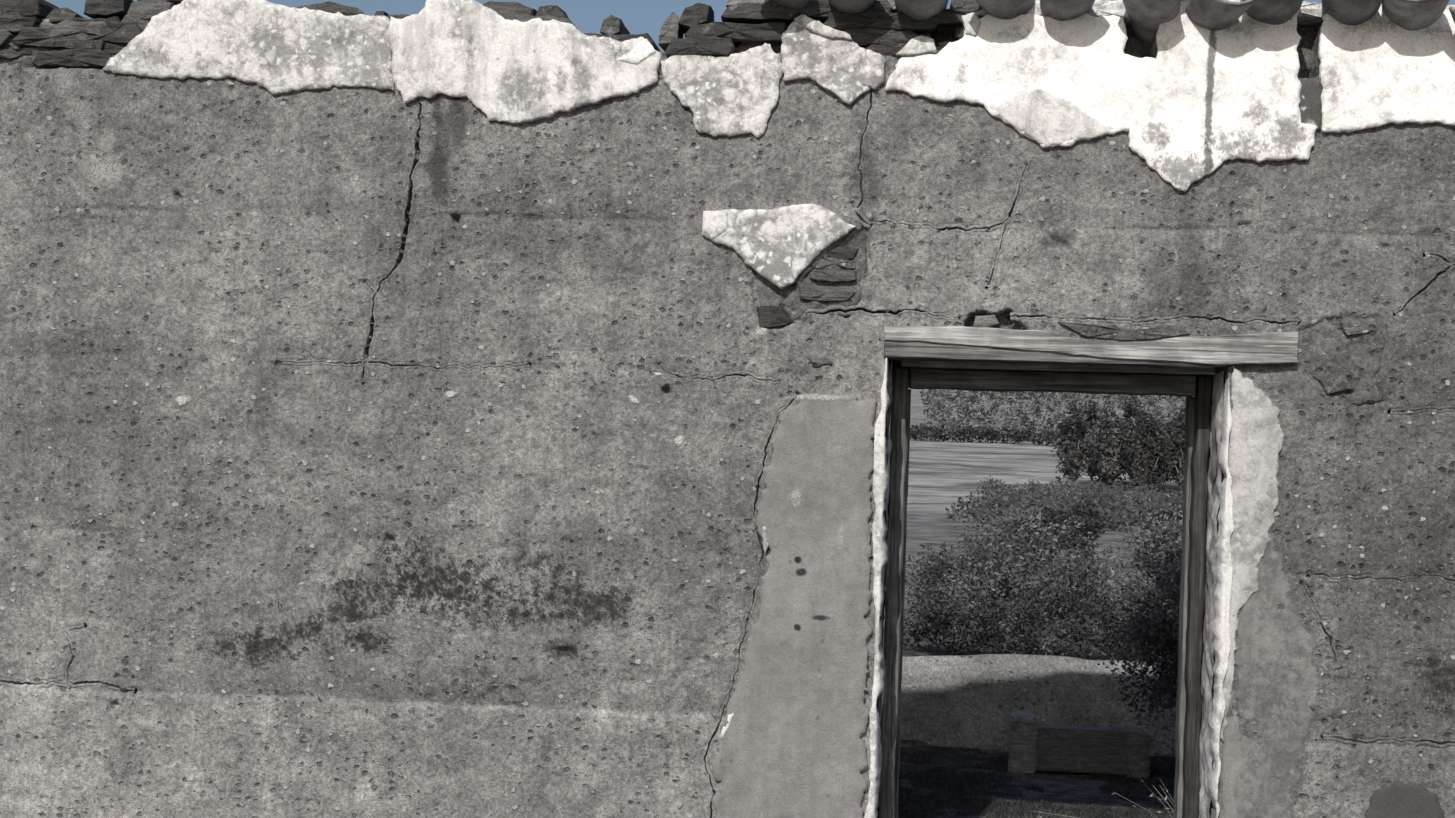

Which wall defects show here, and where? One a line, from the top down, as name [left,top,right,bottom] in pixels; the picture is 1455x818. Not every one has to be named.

crack [277,97,530,382]
flaking render [702,203,867,328]
crack [805,304,959,321]
crack [849,89,1300,327]
crack [1394,251,1455,316]
crack [0,623,135,696]
water stain [200,536,632,667]
flaking render [712,393,877,818]
flaking render [1215,526,1342,818]